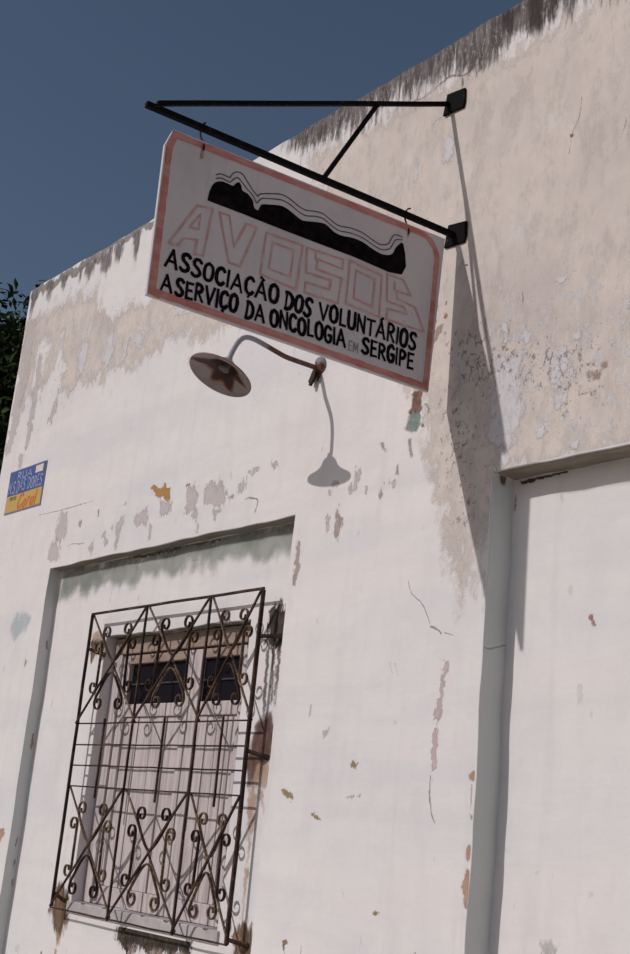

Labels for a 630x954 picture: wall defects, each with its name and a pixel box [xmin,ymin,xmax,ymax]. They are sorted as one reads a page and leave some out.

water stain [289,0,575,155]
peeling [309,0,630,597]
peeling [19,290,228,411]
water stain [497,445,630,484]
peeling [185,467,259,533]
crack [408,583,452,635]
corrosion [247,599,286,849]
peeling [429,661,449,823]
spalling [461,845,471,908]
water stain [116,926,192,954]
corrosion [232,922,253,954]